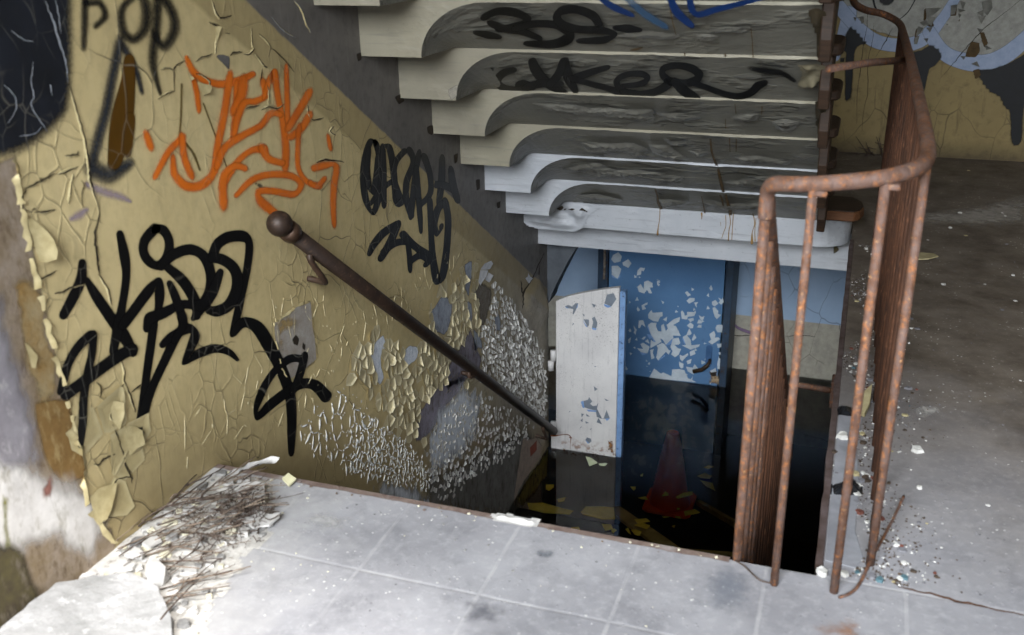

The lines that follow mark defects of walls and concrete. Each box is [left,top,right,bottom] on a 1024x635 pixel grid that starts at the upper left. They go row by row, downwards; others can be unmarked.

crack [158,0,344,163]
peeling [914,0,993,79]
crack [4,0,112,304]
flaking render [0,157,151,597]
crack [94,361,143,484]
peeling [215,253,650,536]
crack [521,254,544,309]
peeling [611,252,724,384]
crack [902,587,1024,616]